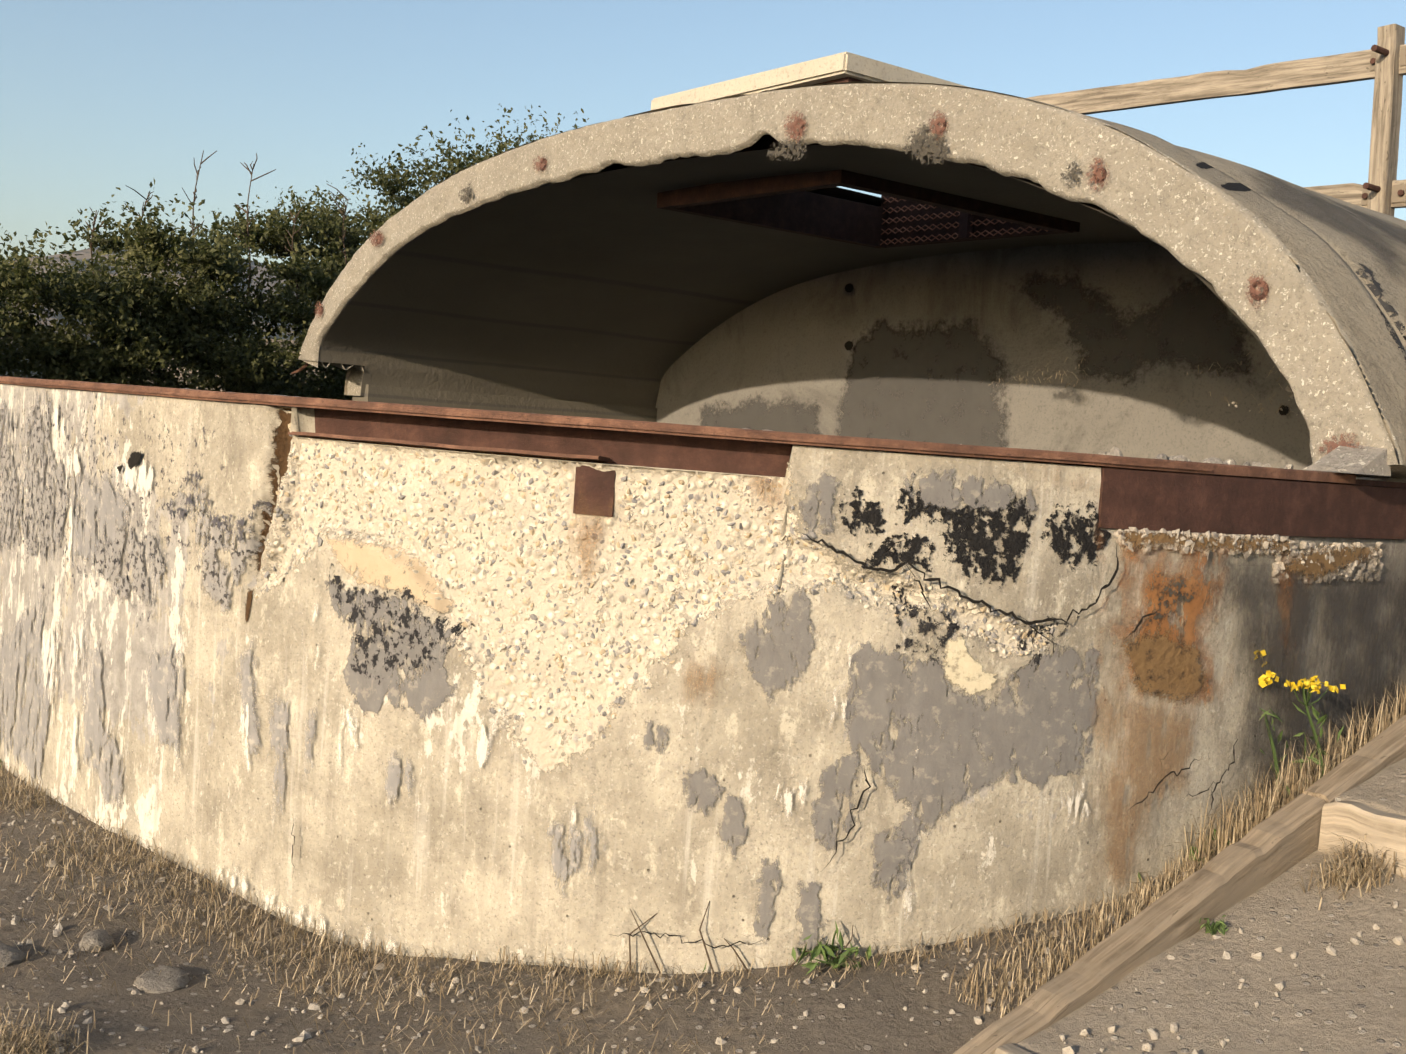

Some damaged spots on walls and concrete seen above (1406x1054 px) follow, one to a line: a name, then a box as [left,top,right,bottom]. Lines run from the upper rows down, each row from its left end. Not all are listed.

rust [783,111,806,142]
rust [1086,157,1110,190]
rust [1245,272,1269,309]
peeling [0,393,71,561]
spalling [115,462,157,498]
spalling [169,423,1057,772]
crack [802,533,1120,653]
crack [1125,610,1158,639]
rust [1117,546,1225,702]